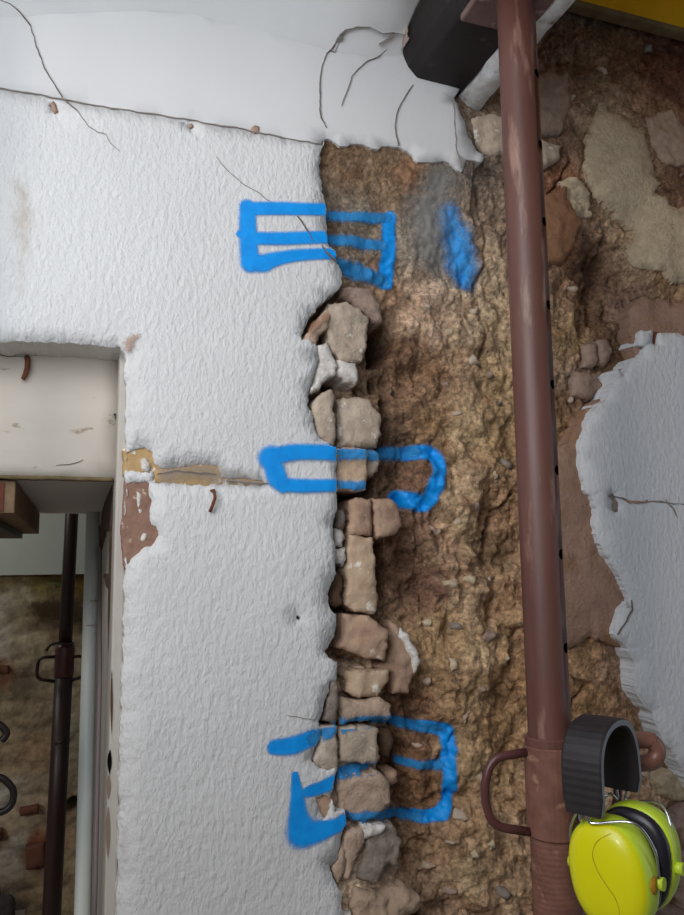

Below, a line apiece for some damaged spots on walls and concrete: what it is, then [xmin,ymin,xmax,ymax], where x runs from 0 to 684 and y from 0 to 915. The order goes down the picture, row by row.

crack [0,0,405,151]
crack [394,85,413,145]
crack [217,158,271,202]
crack [297,216,338,263]
spalling [537,12,684,731]
flaking render [120,447,269,570]
spalling [301,87,533,915]
crack [613,496,684,517]
spalling [604,763,684,863]
spalling [655,875,684,915]